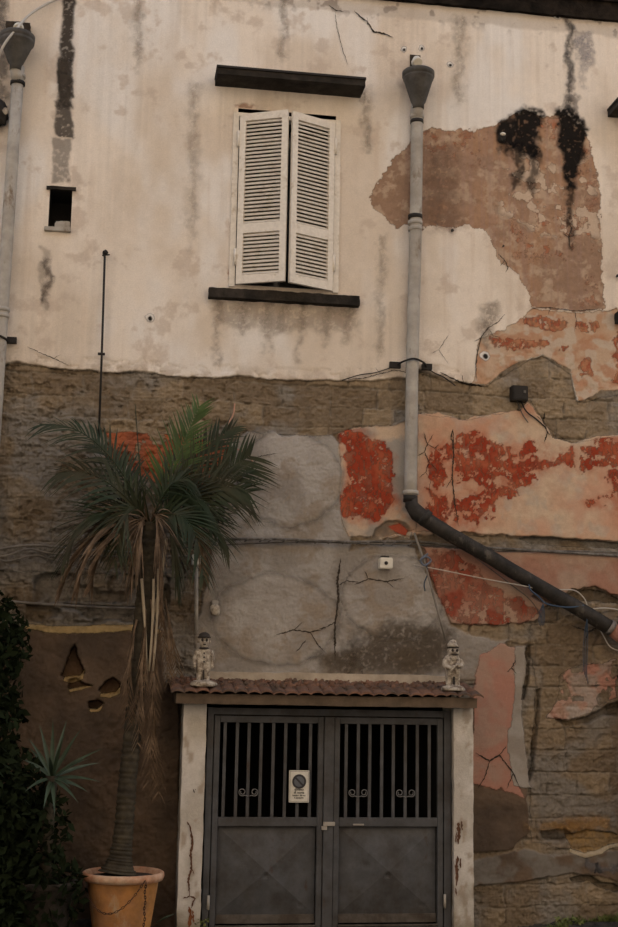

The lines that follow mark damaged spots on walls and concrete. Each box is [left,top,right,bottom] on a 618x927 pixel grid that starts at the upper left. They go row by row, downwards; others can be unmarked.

crack [329,5,391,66]
flaking render [369,141,411,229]
leakage [496,18,592,226]
flaking render [417,114,618,595]
spalling [0,365,430,578]
crack [477,747,519,789]